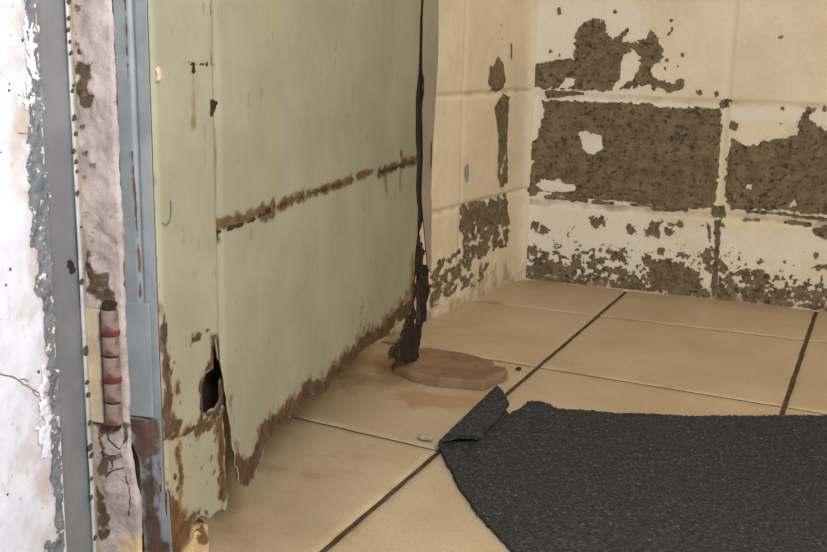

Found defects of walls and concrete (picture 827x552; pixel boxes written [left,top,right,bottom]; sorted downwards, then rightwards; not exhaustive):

corrosion [216,150,417,242]
peeling [429,44,512,308]
peeling [526,18,827,310]
corrosion [130,309,209,552]
corrosion [192,328,233,502]
corrosion [235,262,414,486]